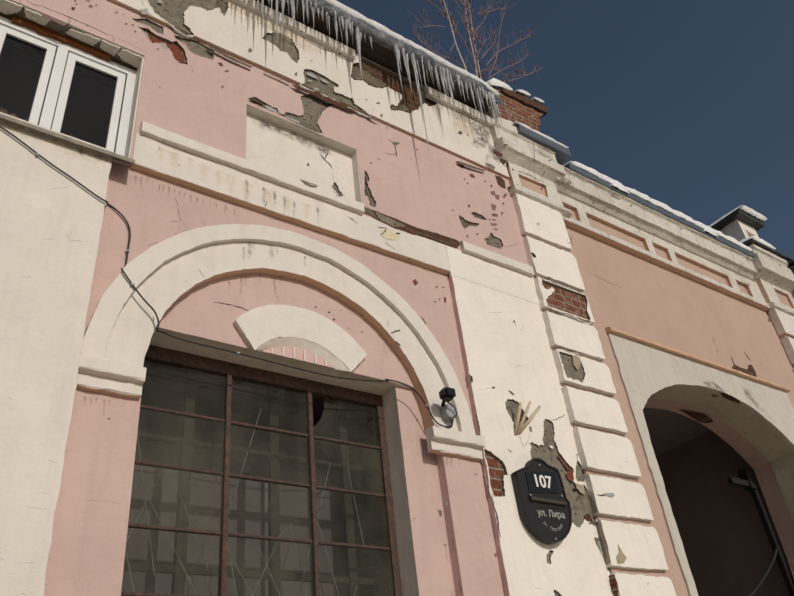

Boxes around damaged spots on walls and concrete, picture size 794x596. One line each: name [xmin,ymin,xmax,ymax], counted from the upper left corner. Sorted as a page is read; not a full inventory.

flaking render [125,0,252,72]
flaking render [247,30,437,136]
peeling [456,161,486,184]
flaking render [363,171,518,249]
flaking render [540,278,591,325]
flaking render [559,349,586,382]
flaking render [731,351,757,377]
flaking render [475,448,508,498]
flaking render [505,391,627,596]